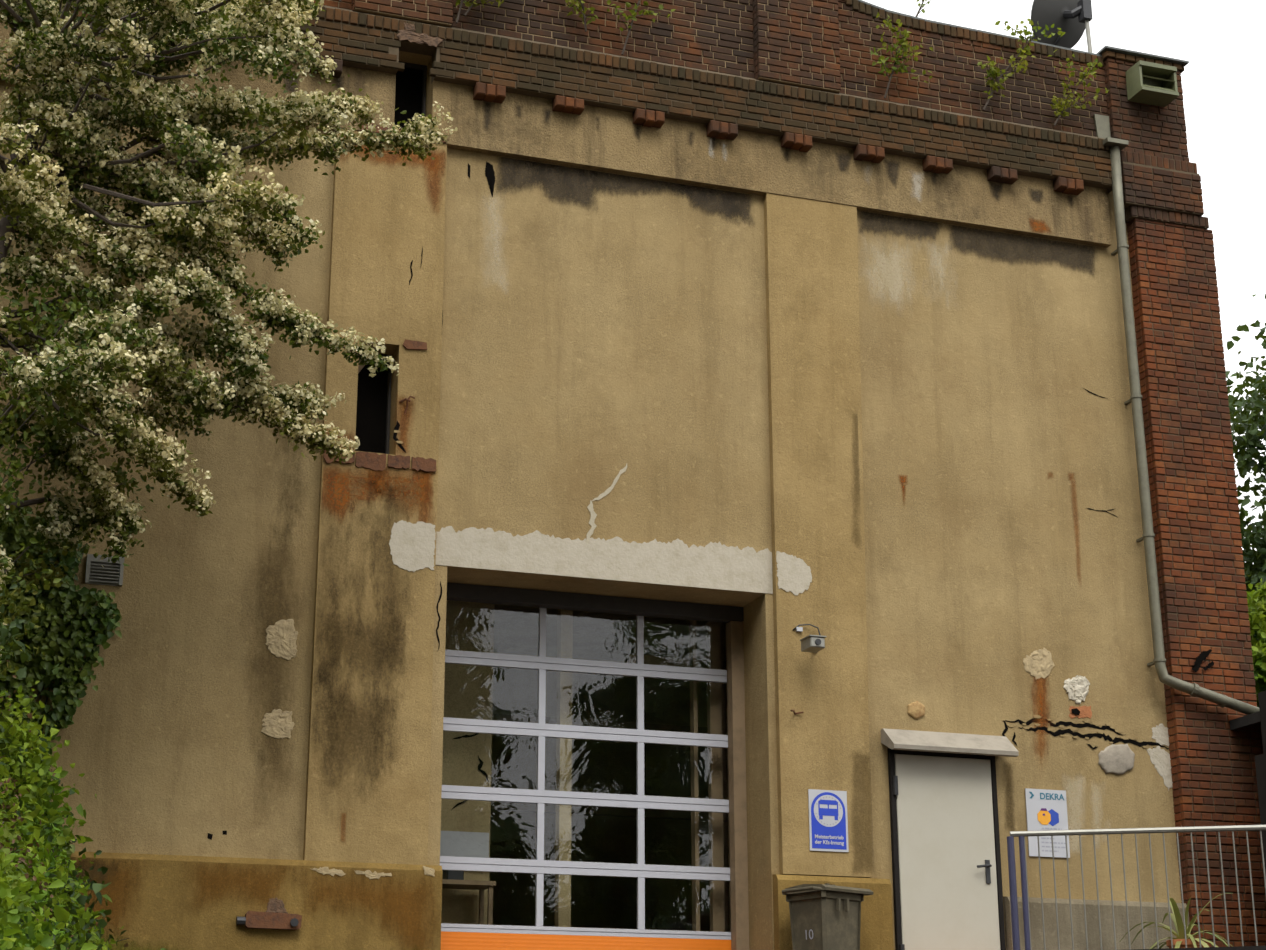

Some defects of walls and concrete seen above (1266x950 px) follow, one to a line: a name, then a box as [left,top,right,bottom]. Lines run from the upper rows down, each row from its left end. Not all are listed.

rust [322,468,431,523]
crack [587,464,627,543]
peeling [265,619,298,660]
spalling [1023,648,1054,679]
peeling [261,709,295,739]
rust [1032,678,1048,756]
spalling [1063,675,1092,719]
crack [1002,715,1169,750]